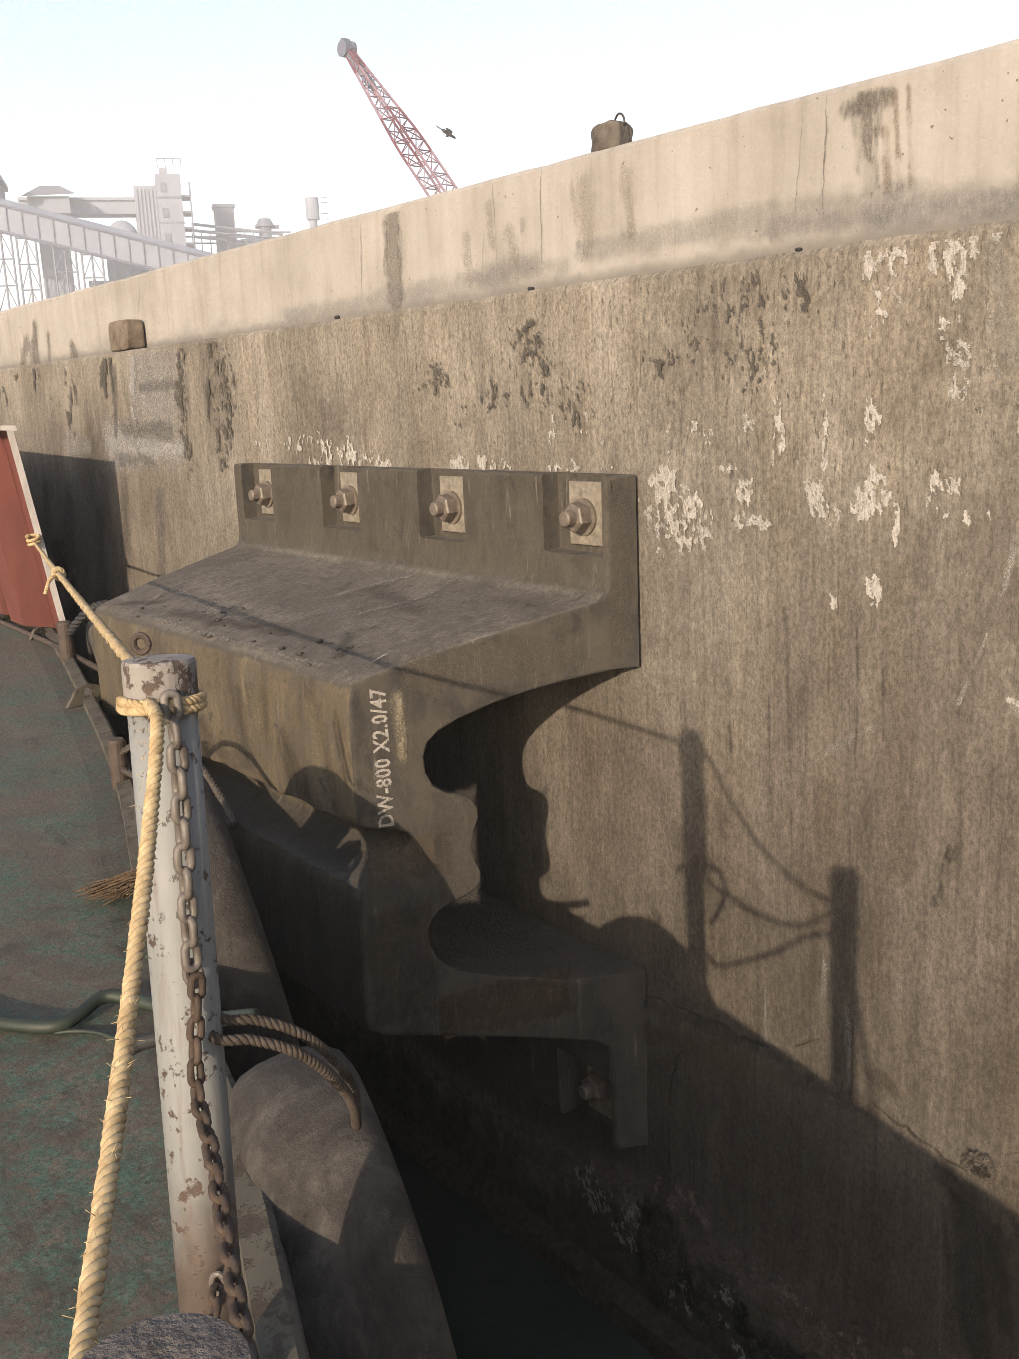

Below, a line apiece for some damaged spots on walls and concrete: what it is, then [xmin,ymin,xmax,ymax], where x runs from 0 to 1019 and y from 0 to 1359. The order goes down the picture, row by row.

water stain [844,89,894,161]
peeling [862,245,908,337]
peeling [928,232,1003,401]
peeling [638,421,713,558]
peeling [718,463,772,531]
peeling [803,387,900,547]
peeling [865,573,882,607]